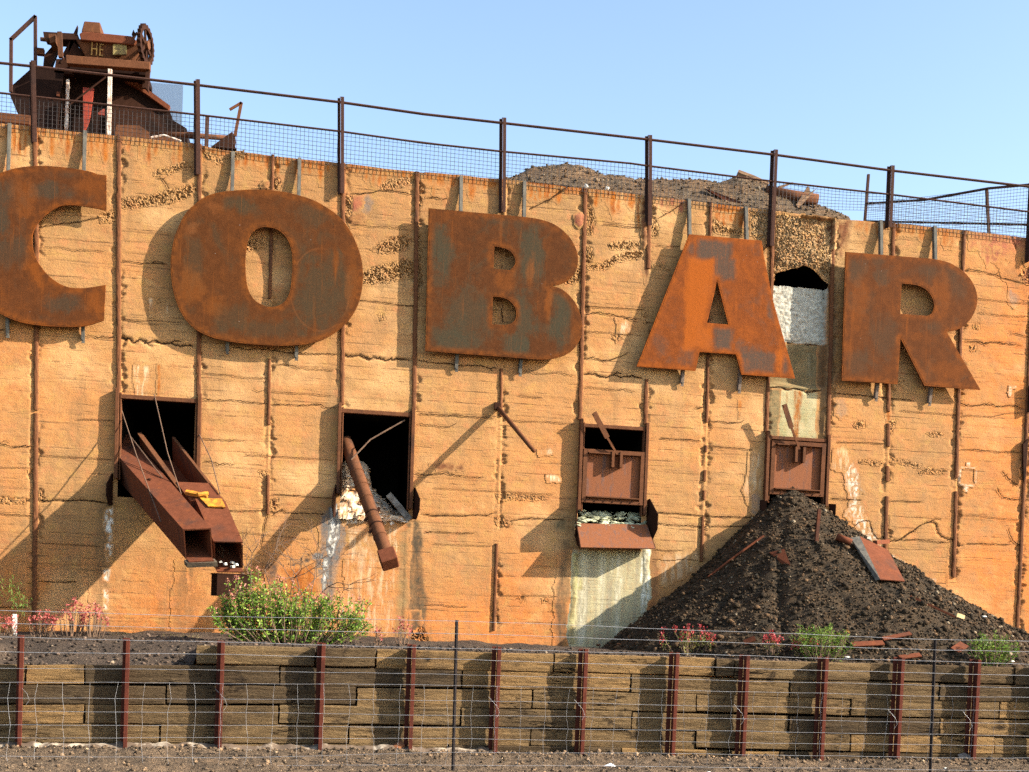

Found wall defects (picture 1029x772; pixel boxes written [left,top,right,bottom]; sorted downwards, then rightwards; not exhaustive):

spalling [712,209,832,290]
crack [967,236,1028,345]
leakage [741,282,850,516]
leakage [830,446,907,563]
crack [770,386,1029,547]
leakage [284,501,432,638]
leakage [551,536,700,648]